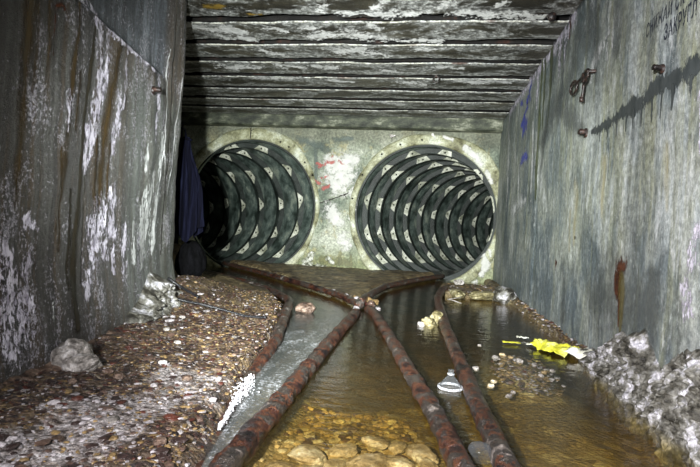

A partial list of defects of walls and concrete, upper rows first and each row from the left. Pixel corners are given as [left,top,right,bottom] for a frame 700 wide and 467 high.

rust [55,1,81,252]
rust [93,44,123,215]
leakage [65,0,186,333]
leakage [590,28,613,83]
leakage [591,54,700,141]
leakage [21,211,39,232]
leakage [0,236,62,384]
rust [614,257,627,333]
leakage [679,221,700,323]